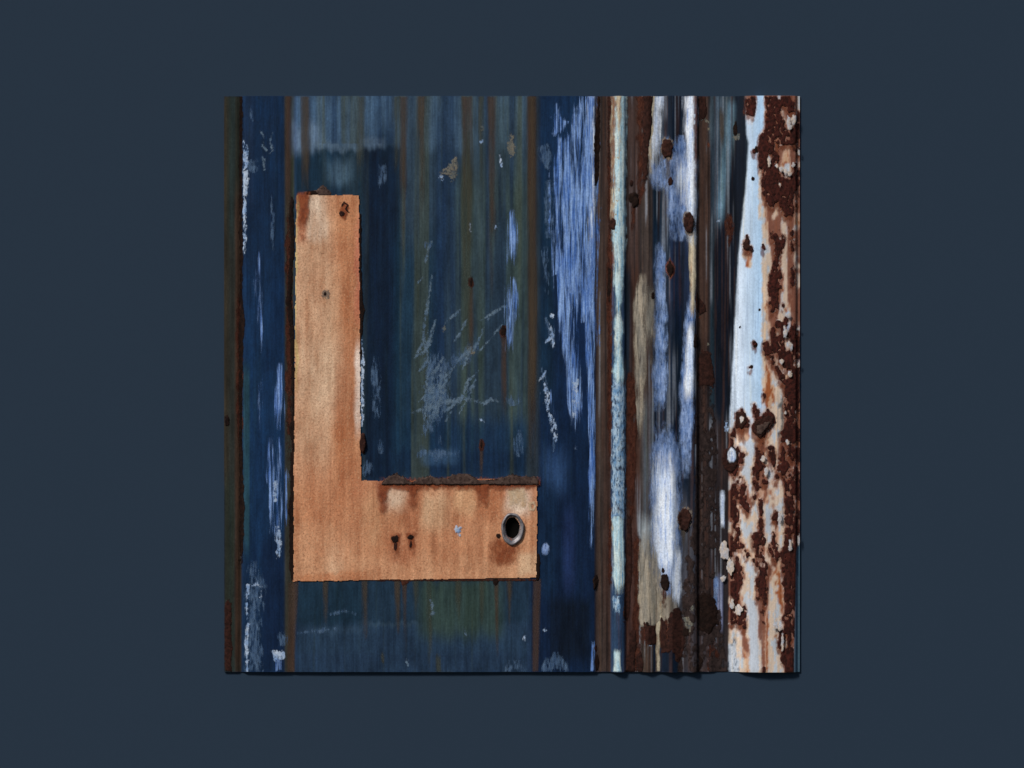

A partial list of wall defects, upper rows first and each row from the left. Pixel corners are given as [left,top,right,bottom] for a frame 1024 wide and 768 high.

corrosion [287,162,331,224]
peeling [779,313,800,377]
peeling [540,372,557,442]
peeling [545,96,698,671]
corrosion [593,96,799,672]
spalling [721,411,786,477]
corrosion [378,472,539,511]